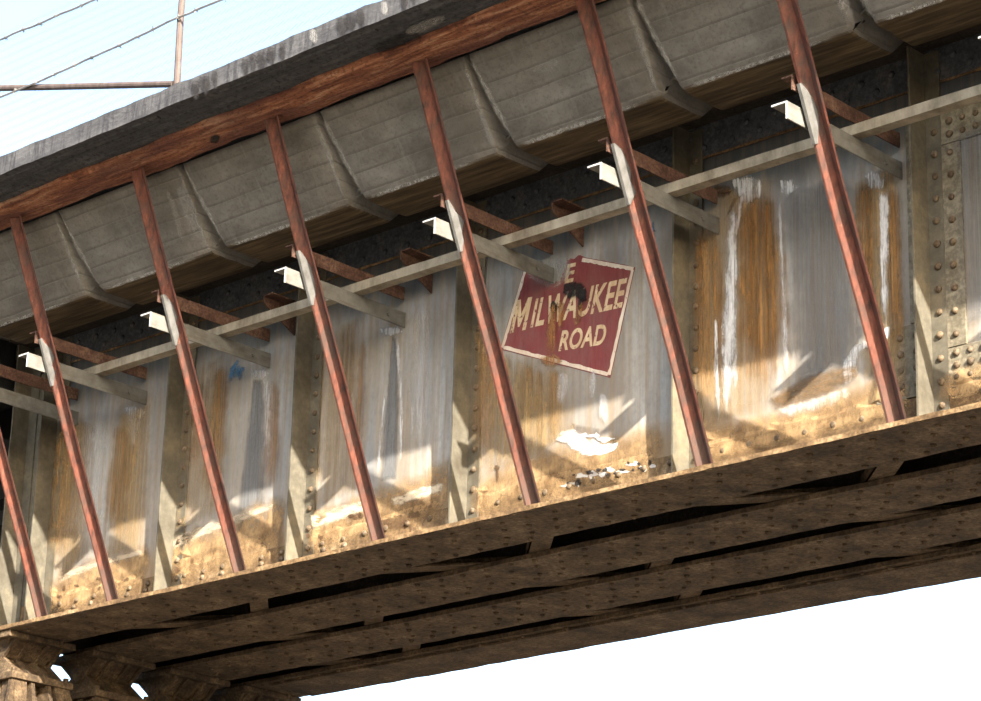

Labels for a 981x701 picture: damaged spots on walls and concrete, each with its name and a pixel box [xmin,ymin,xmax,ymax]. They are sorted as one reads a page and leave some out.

corrosion [50,434,104,611]
corrosion [108,549,149,593]
corrosion [475,336,523,511]
corrosion [505,282,661,496]
peeling [556,430,618,456]
peeling [560,460,656,487]
corrosion [695,184,884,458]
corrosion [856,170,907,405]
corrosion [945,367,981,399]